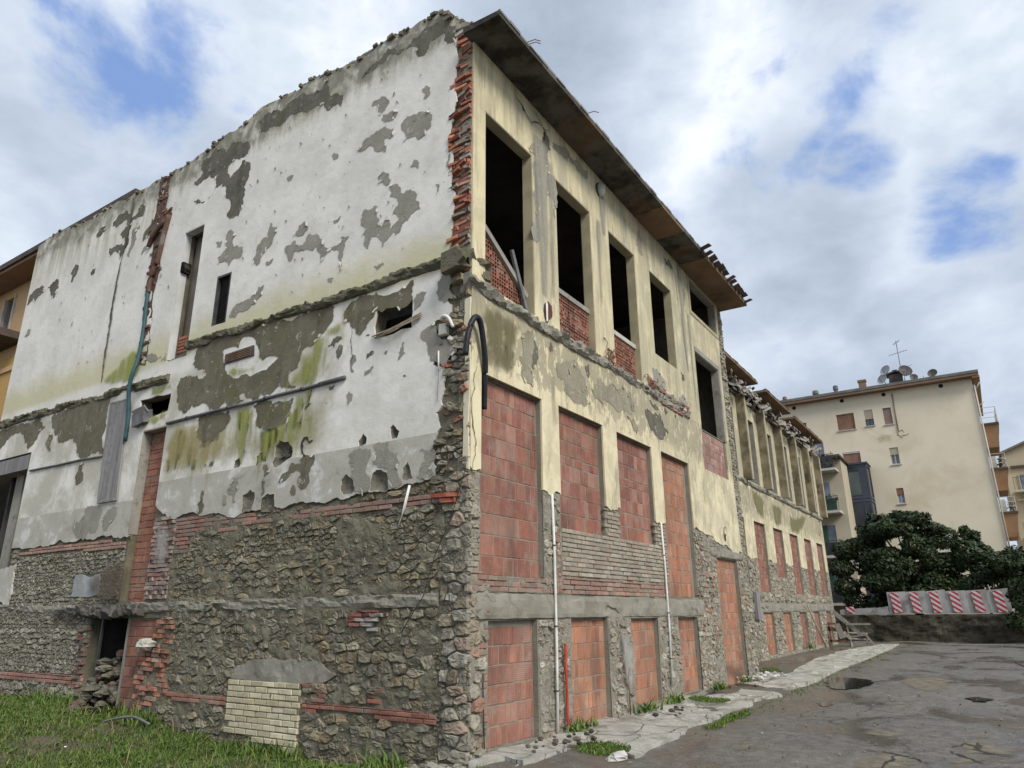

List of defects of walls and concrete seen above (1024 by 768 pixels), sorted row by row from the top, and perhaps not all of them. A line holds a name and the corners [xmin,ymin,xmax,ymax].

flaking render [259,78,347,133]
flaking render [194,141,287,275]
flaking render [361,170,420,249]
crack [101,198,134,382]
flaking render [0,396,110,485]
water stain [106,352,138,383]
water stain [172,408,252,463]
flaking render [223,441,315,514]
water stain [258,325,340,464]
flaking render [177,246,492,447]
flaking render [341,425,436,496]
flaking render [520,330,690,440]